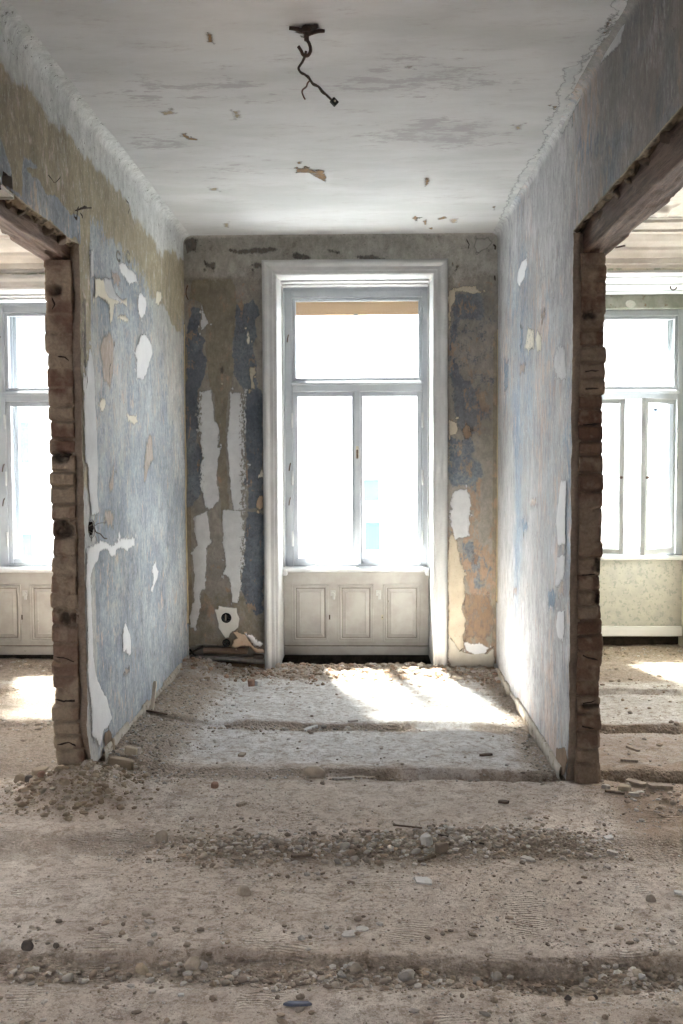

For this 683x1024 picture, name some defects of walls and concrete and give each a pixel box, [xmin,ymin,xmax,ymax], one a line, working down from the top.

spalling [0,171,78,247]
peeling [295,162,326,181]
flaking render [44,260,138,766]
flaking render [548,253,607,784]
flaking render [447,531,495,668]